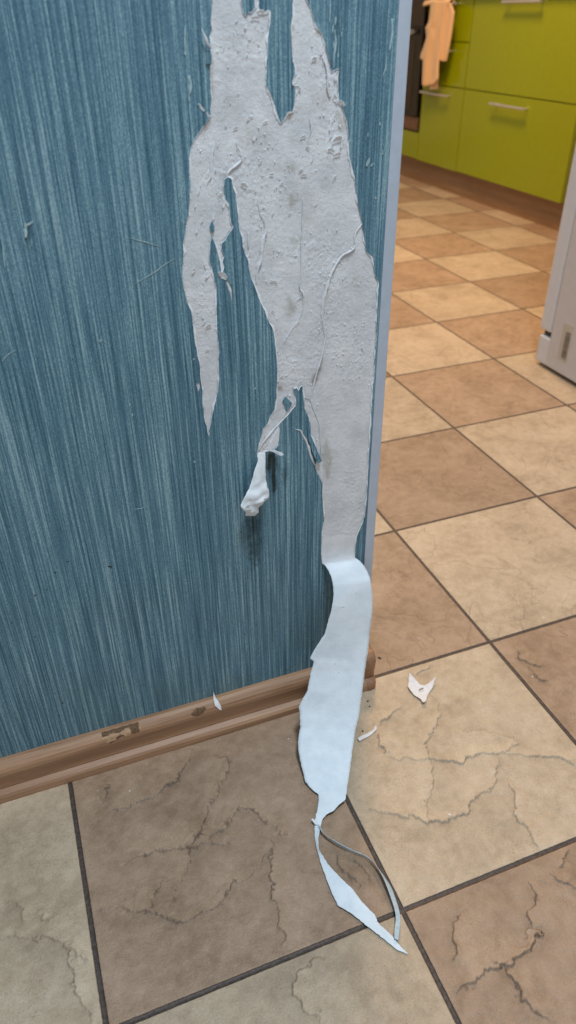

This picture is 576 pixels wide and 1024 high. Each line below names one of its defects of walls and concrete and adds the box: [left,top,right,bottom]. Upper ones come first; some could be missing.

peeling [182,0,379,548]